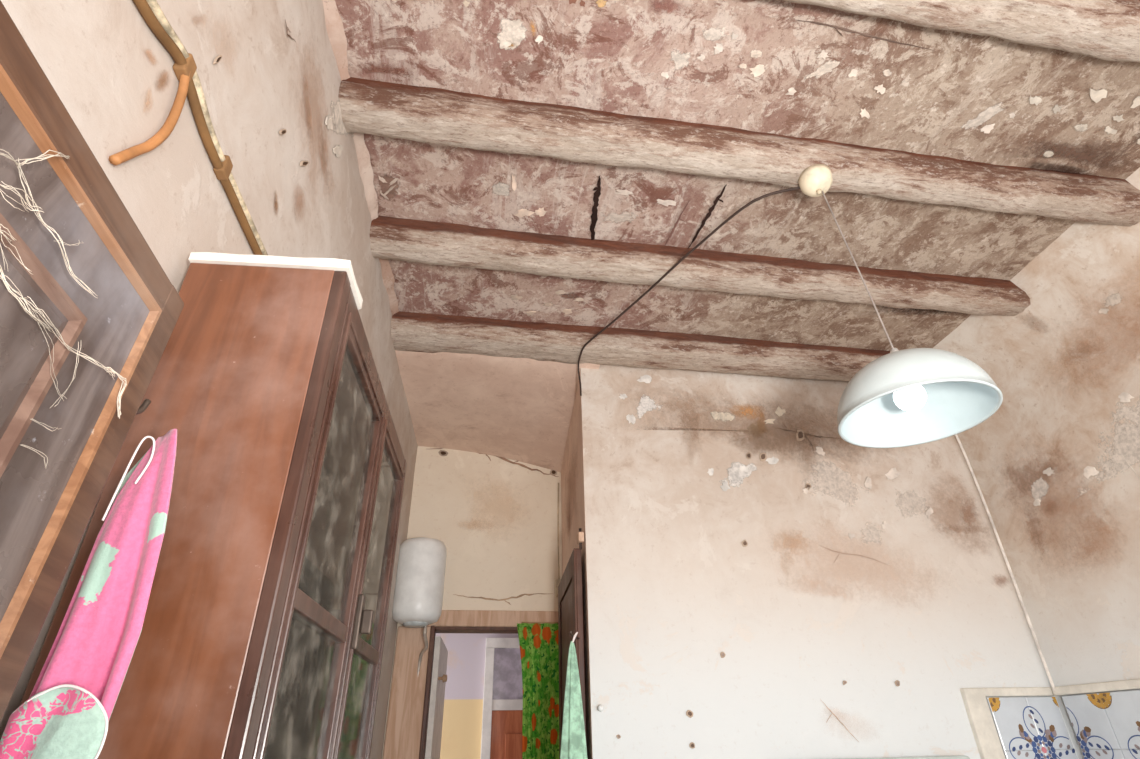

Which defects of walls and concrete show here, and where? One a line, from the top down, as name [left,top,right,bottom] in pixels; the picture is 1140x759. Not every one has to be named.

crack [590,176,601,240]
crack [664,184,727,248]
peeling [619,375,663,424]
peeling [707,452,779,491]
crack [453,593,545,605]